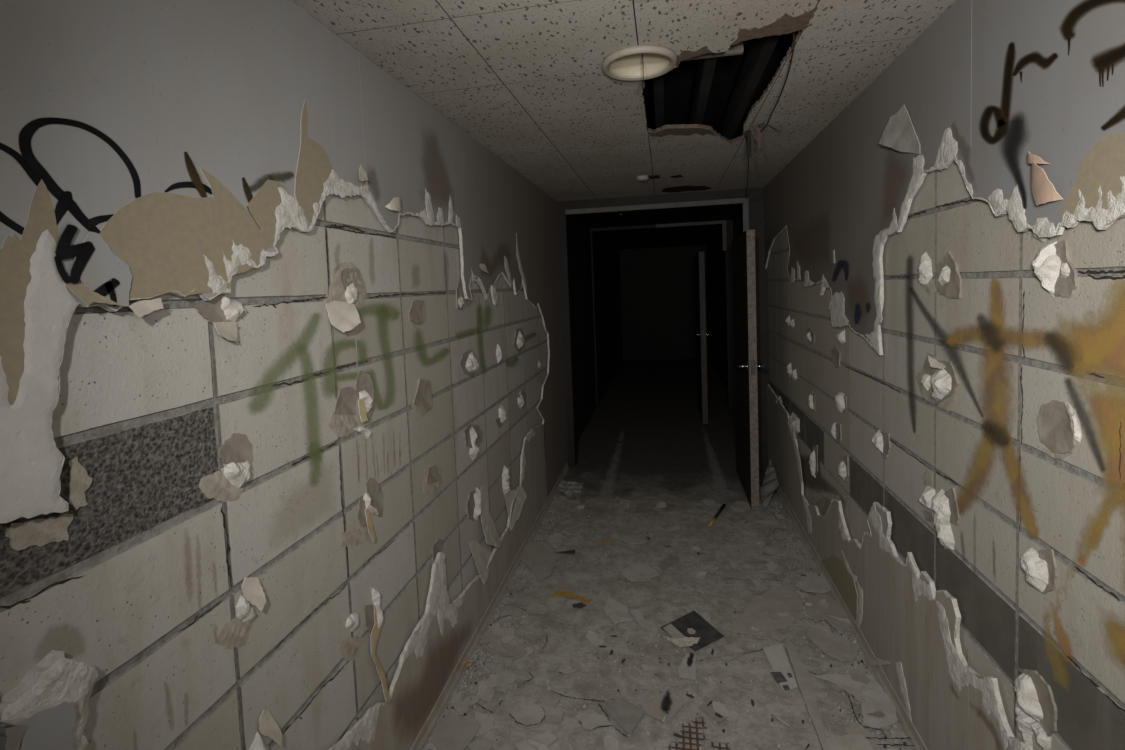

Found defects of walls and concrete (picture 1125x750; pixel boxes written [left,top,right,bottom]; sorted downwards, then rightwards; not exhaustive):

spalling [730,6,818,46]
spalling [676,46,712,68]
flaking render [812,674,898,728]